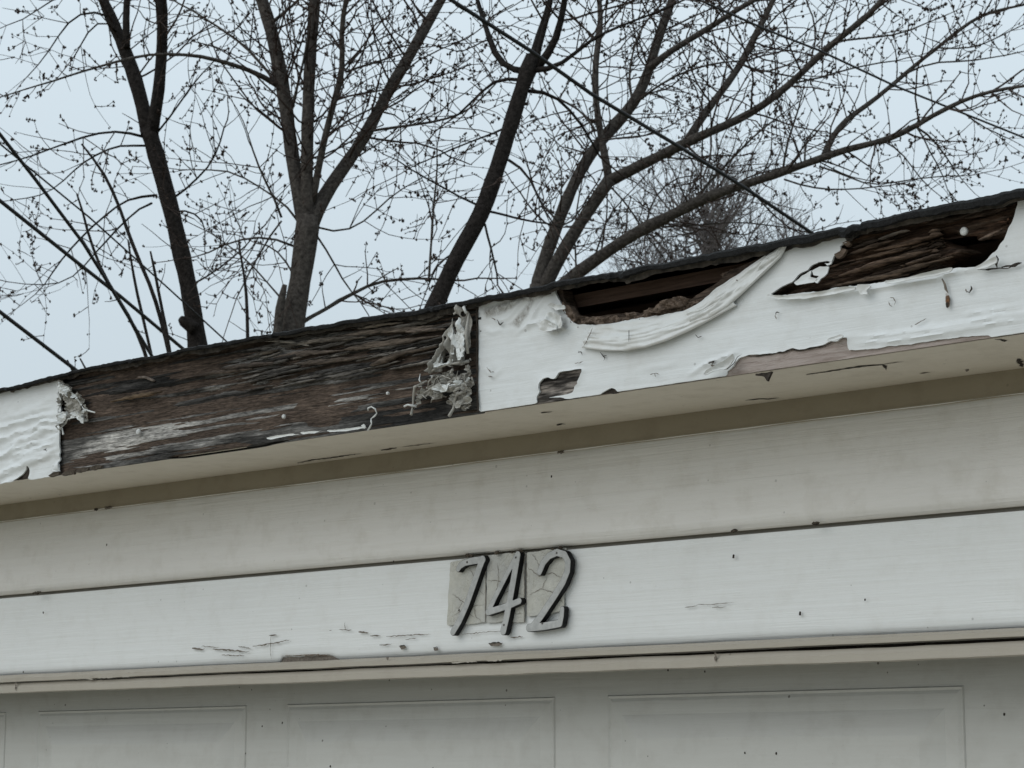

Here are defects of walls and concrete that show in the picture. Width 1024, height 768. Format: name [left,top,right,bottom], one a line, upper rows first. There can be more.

peeling [582,247,786,359]
peeling [794,261,833,285]
peeling [856,284,871,295]
peeling [404,305,479,417]
peeling [704,334,994,381]
peeling [55,380,96,435]
peeling [267,406,377,440]
peeling [533,369,581,405]